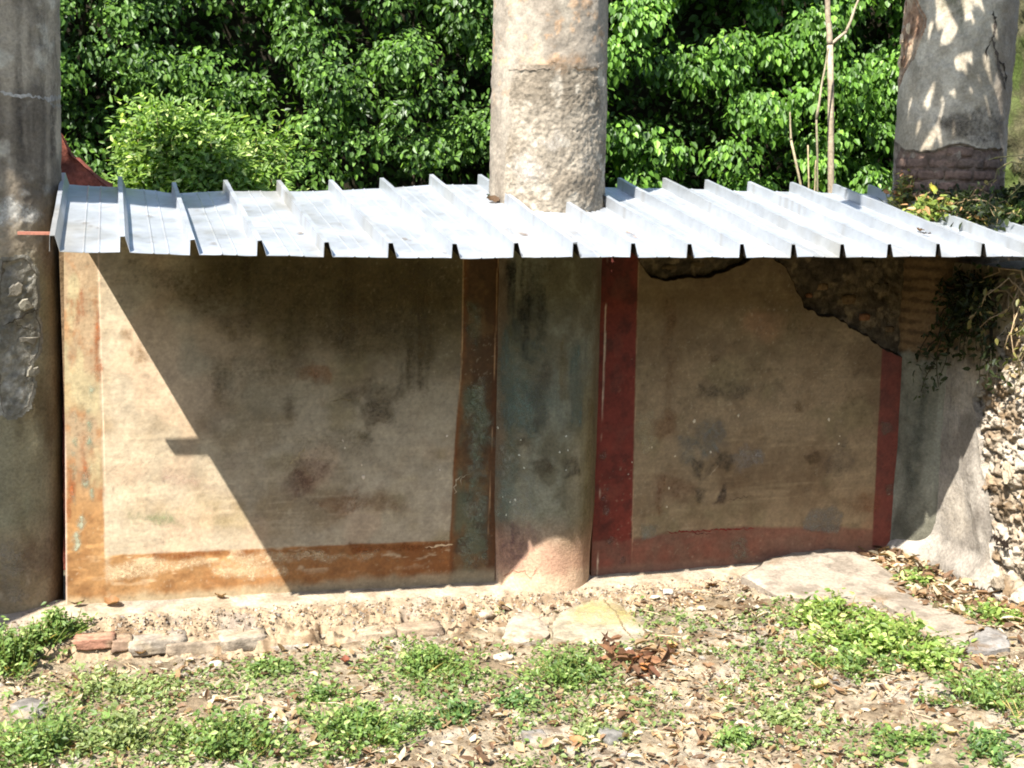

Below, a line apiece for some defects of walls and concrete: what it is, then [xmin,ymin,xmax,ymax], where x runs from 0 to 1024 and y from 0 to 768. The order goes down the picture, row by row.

crack [985,11,1007,91]
spalling [0,255,43,420]
spalling [773,254,905,357]